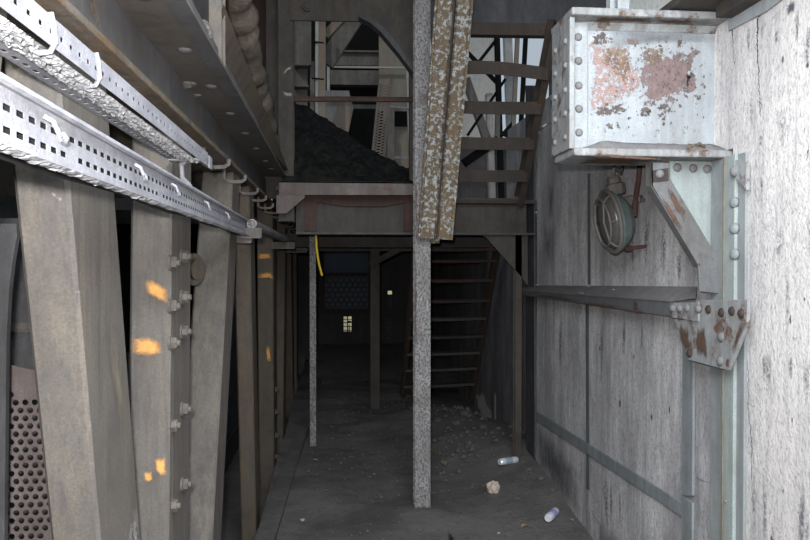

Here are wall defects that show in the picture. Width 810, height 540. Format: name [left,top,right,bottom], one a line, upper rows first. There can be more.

rust [592,32,612,45]
rust [596,104,624,129]
rust [640,104,682,117]
rust [680,326,707,356]